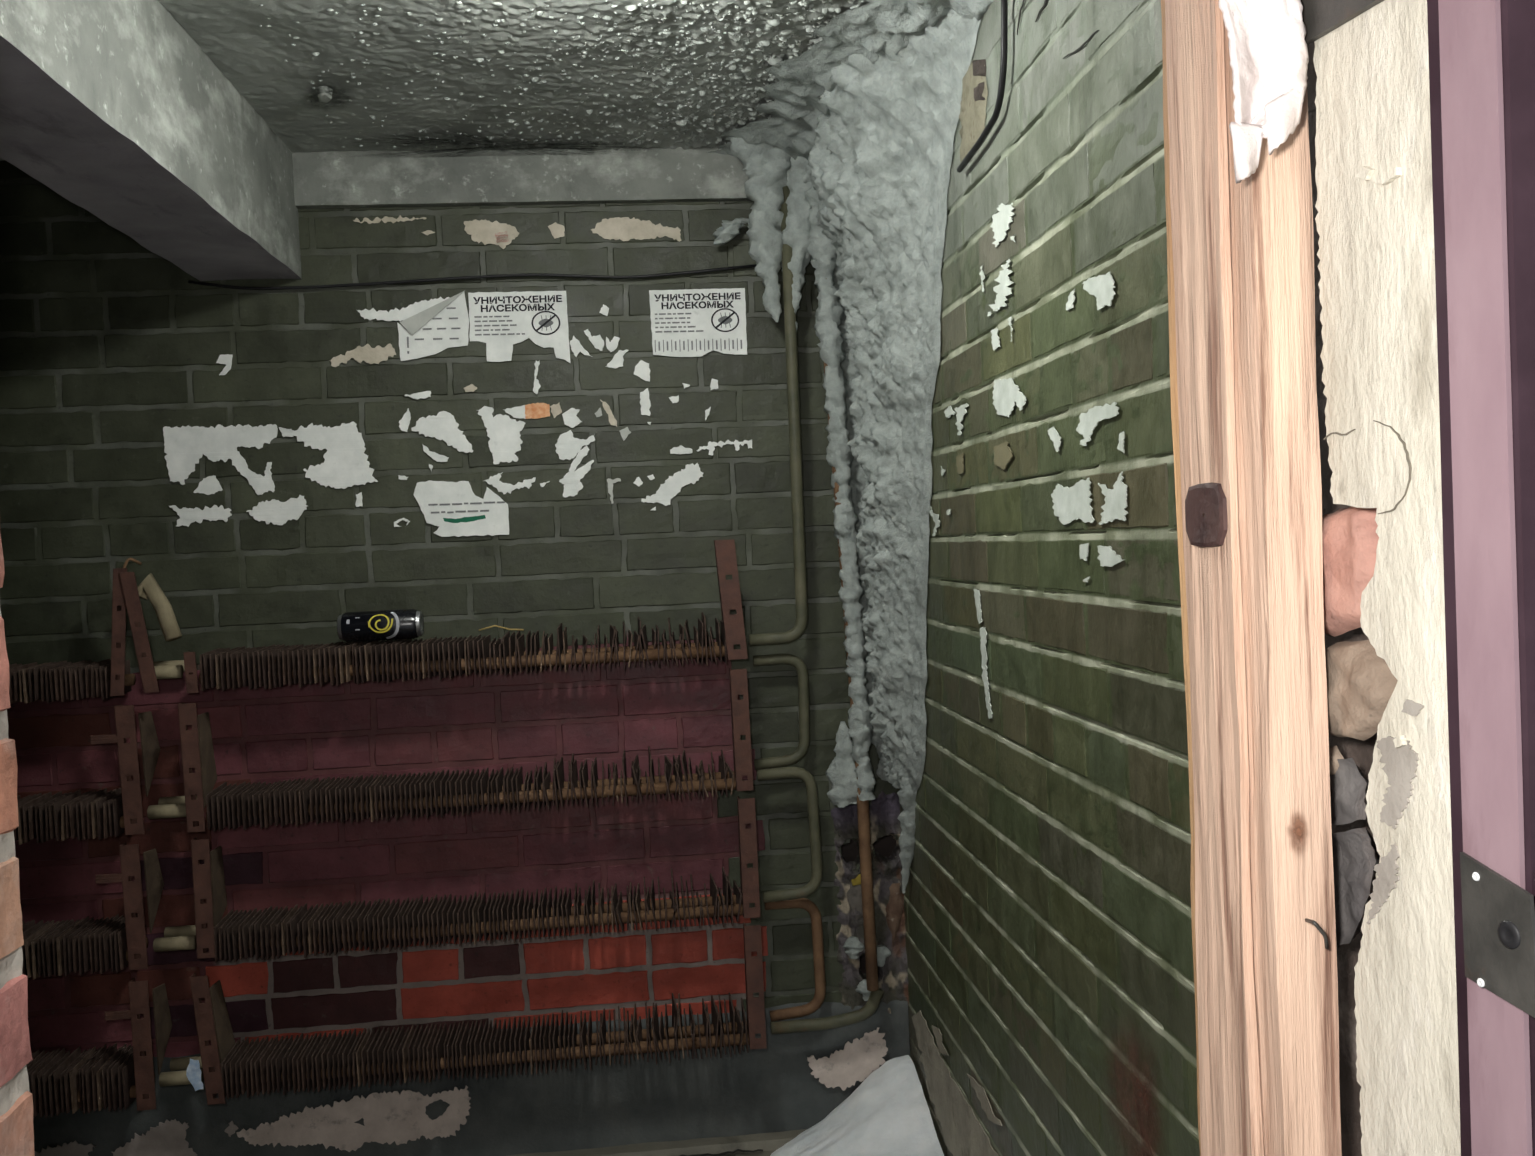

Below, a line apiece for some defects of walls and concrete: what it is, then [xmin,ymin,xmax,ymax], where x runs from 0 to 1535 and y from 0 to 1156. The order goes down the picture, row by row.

peeling [464,219,519,249]
peeling [591,217,682,242]
peeling [979,203,1016,351]
peeling [1066,272,1116,310]
peeling [330,344,396,367]
peeling [992,378,1027,417]
peeling [1048,402,1125,453]
peeling [1051,471,1128,525]
peeling [1079,543,1123,582]
flaking render [1322,506,1424,947]
spalling [807,791,1002,1156]
peeling [225,1086,471,1152]